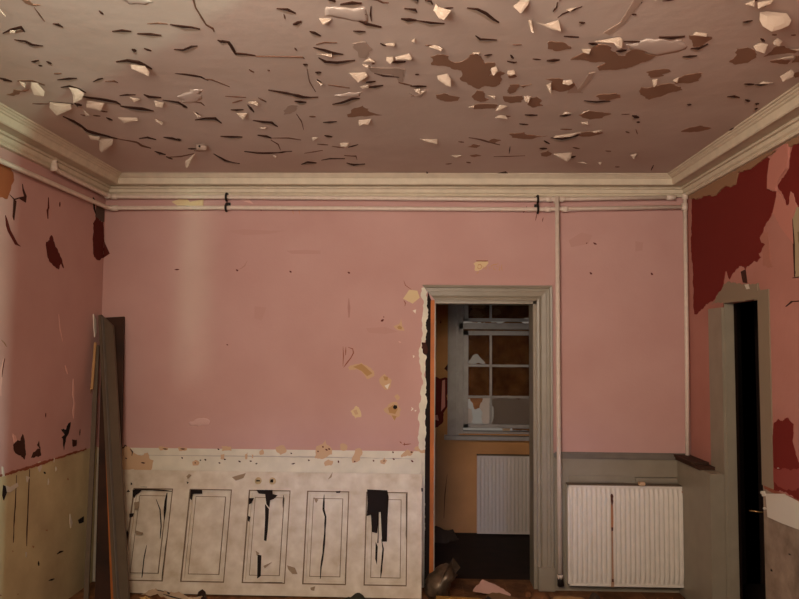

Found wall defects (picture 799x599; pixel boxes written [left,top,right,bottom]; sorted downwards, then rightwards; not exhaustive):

peeling [7,81,104,116]
peeling [434,4,451,20]
peeling [429,45,543,119]
peeling [546,37,701,101]
peeling [729,0,799,84]
peeling [93,217,110,260]
peeling [691,144,799,314]
peeling [772,418,799,470]
spalling [257,490,277,541]
crack [319,498,327,579]
spalling [367,489,389,578]
peeling [766,482,799,530]